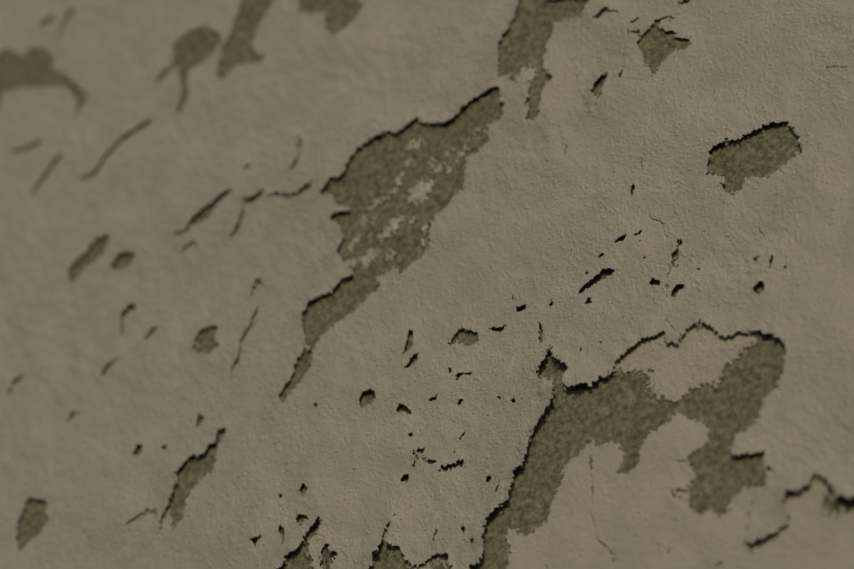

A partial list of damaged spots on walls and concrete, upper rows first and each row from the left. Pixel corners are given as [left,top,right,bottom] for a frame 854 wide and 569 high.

peeling [0,1,94,122]
peeling [150,0,279,120]
peeling [259,0,701,365]
peeling [698,113,814,201]
peeling [188,317,222,361]
peeling [359,312,794,569]
peeling [10,492,53,557]
peeling [268,505,329,569]
crack [589,449,617,568]
spalling [744,462,854,544]